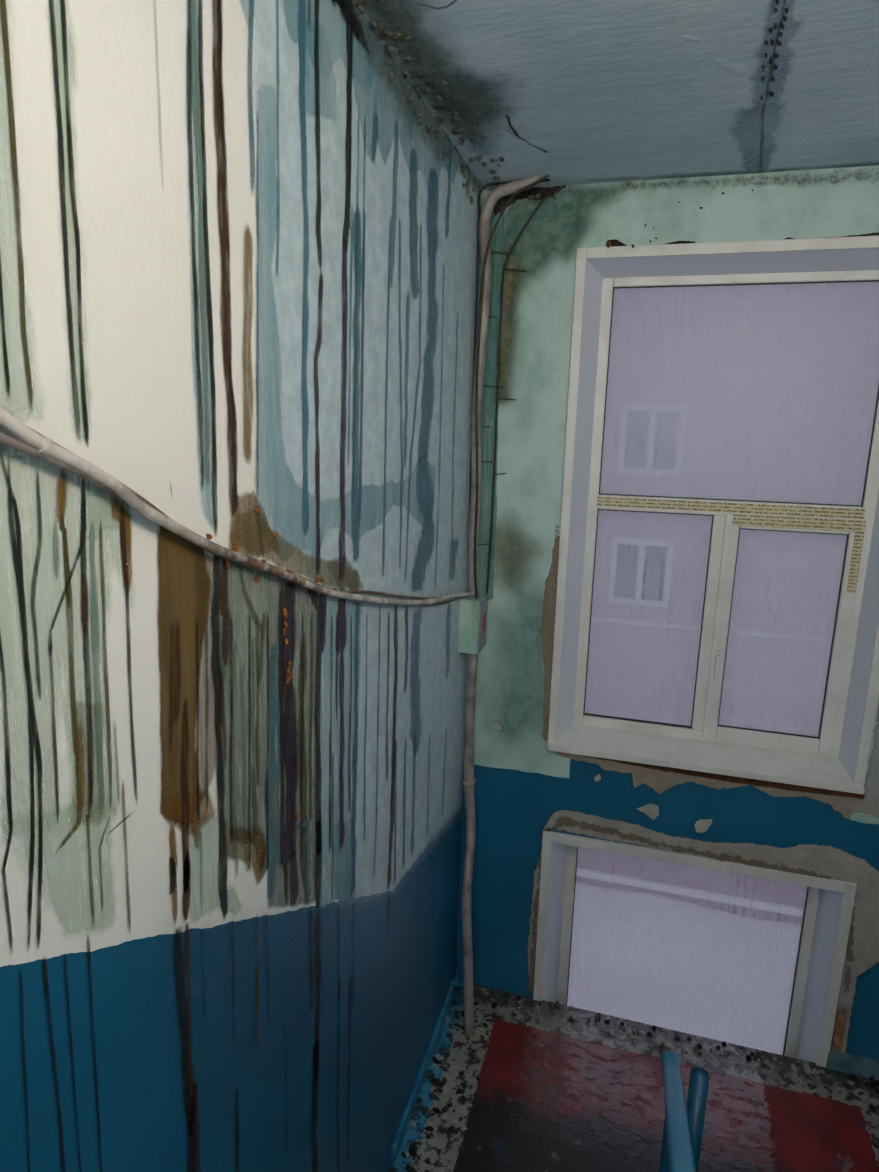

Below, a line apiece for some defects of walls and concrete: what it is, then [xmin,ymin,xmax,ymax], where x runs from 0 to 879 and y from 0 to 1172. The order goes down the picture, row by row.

leakage [0,0,33,418]
leakage [49,0,89,444]
leakage [187,0,474,591]
crack [733,0,797,173]
rust [158,494,421,921]
flaking render [541,525,560,741]
flaking render [527,704,879,1053]
leakage [20,971,30,1172]
leakage [43,959,82,1172]
leakage [87,940,102,1172]
leakage [174,924,201,1172]
leakage [310,911,321,1172]